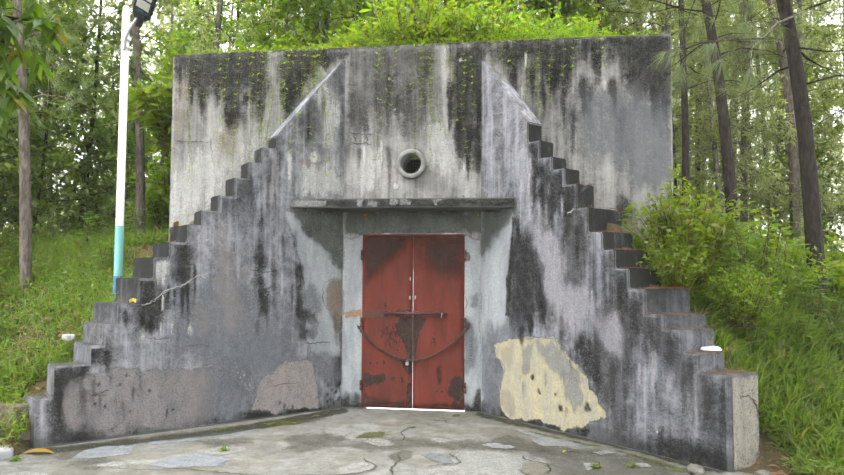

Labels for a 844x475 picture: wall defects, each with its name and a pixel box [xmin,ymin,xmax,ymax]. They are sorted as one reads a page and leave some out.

water stain [308,83,352,147]
water stain [426,91,481,177]
water stain [510,54,672,190]
crack [140,273,208,311]
water stain [287,158,724,475]
water stain [34,260,347,468]
spalling [250,360,340,415]
corrosion [363,316,427,405]
corrosion [436,375,463,402]
spalling [494,335,606,447]
crack [91,466,248,475]
crack [306,414,446,475]